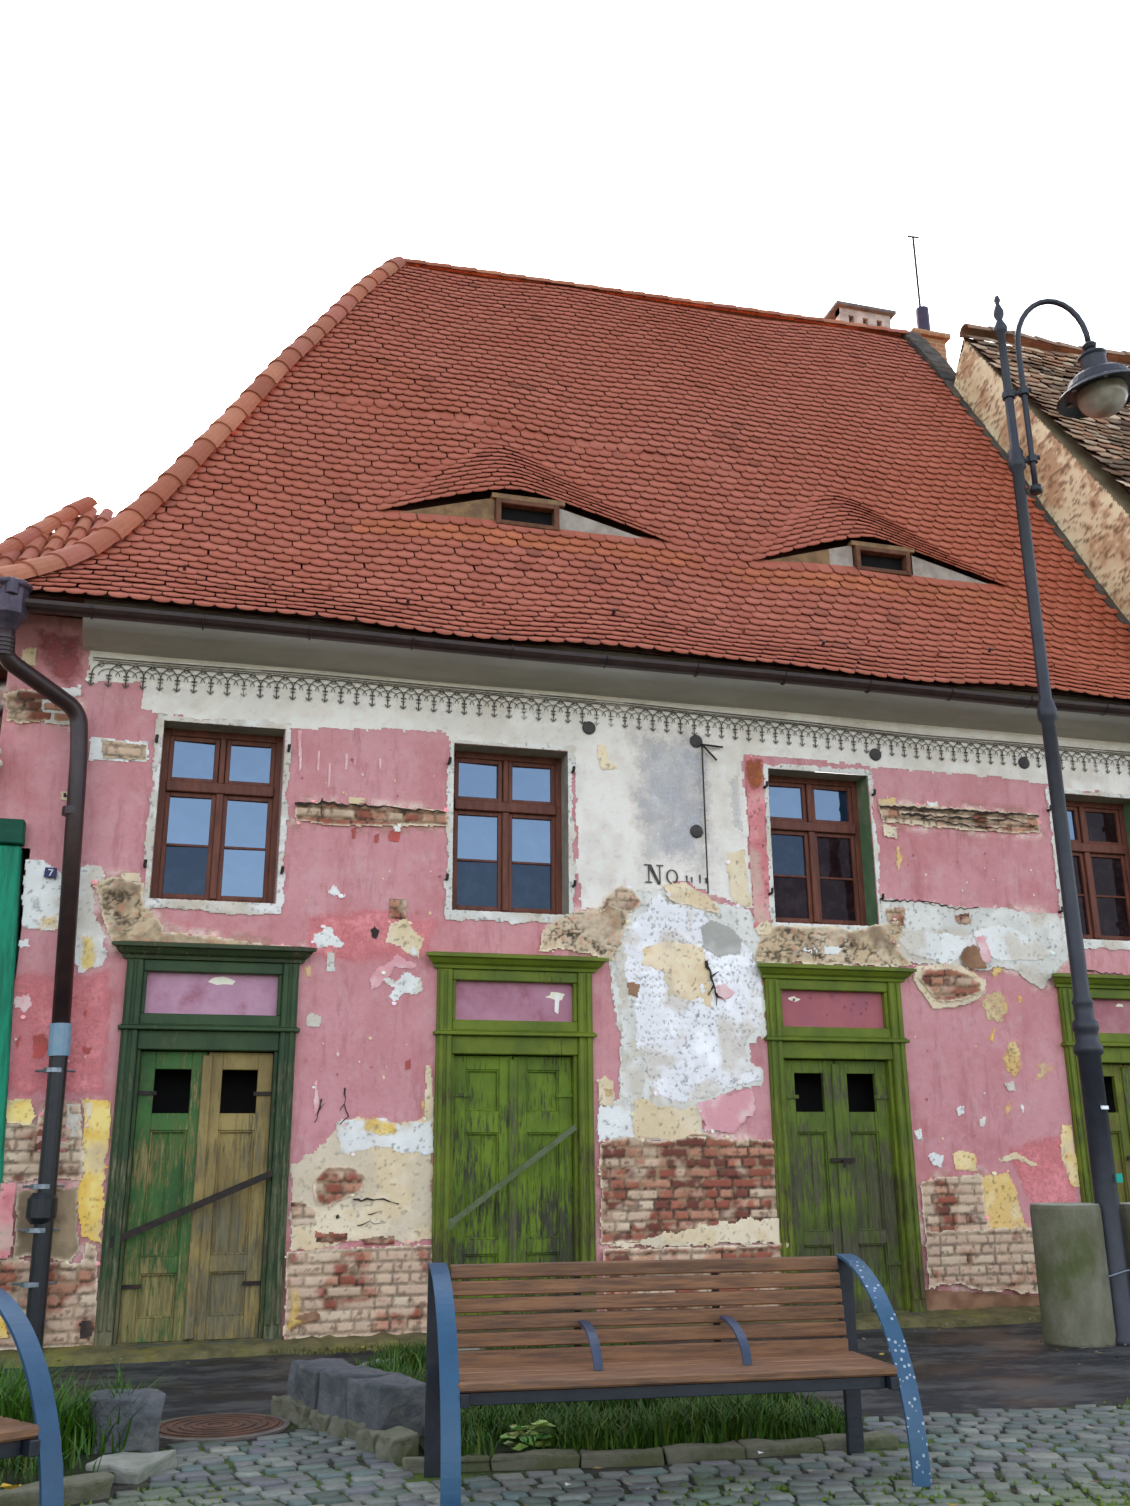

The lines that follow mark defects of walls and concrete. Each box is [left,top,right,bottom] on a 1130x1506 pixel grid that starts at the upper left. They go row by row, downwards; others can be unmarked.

spalling [0,678,90,724]
spalling [289,797,449,832]
spalling [878,800,1043,839]
peeling [18,859,62,948]
spalling [74,863,344,973]
spalling [539,882,1069,1311]
spalling [3,1098,45,1189]
peeling [1060,1125,1080,1187]
spalling [43,1098,111,1348]
spalling [283,1065,434,1340]
spalling [0,1252,30,1315]
spalling [0,1325,17,1350]